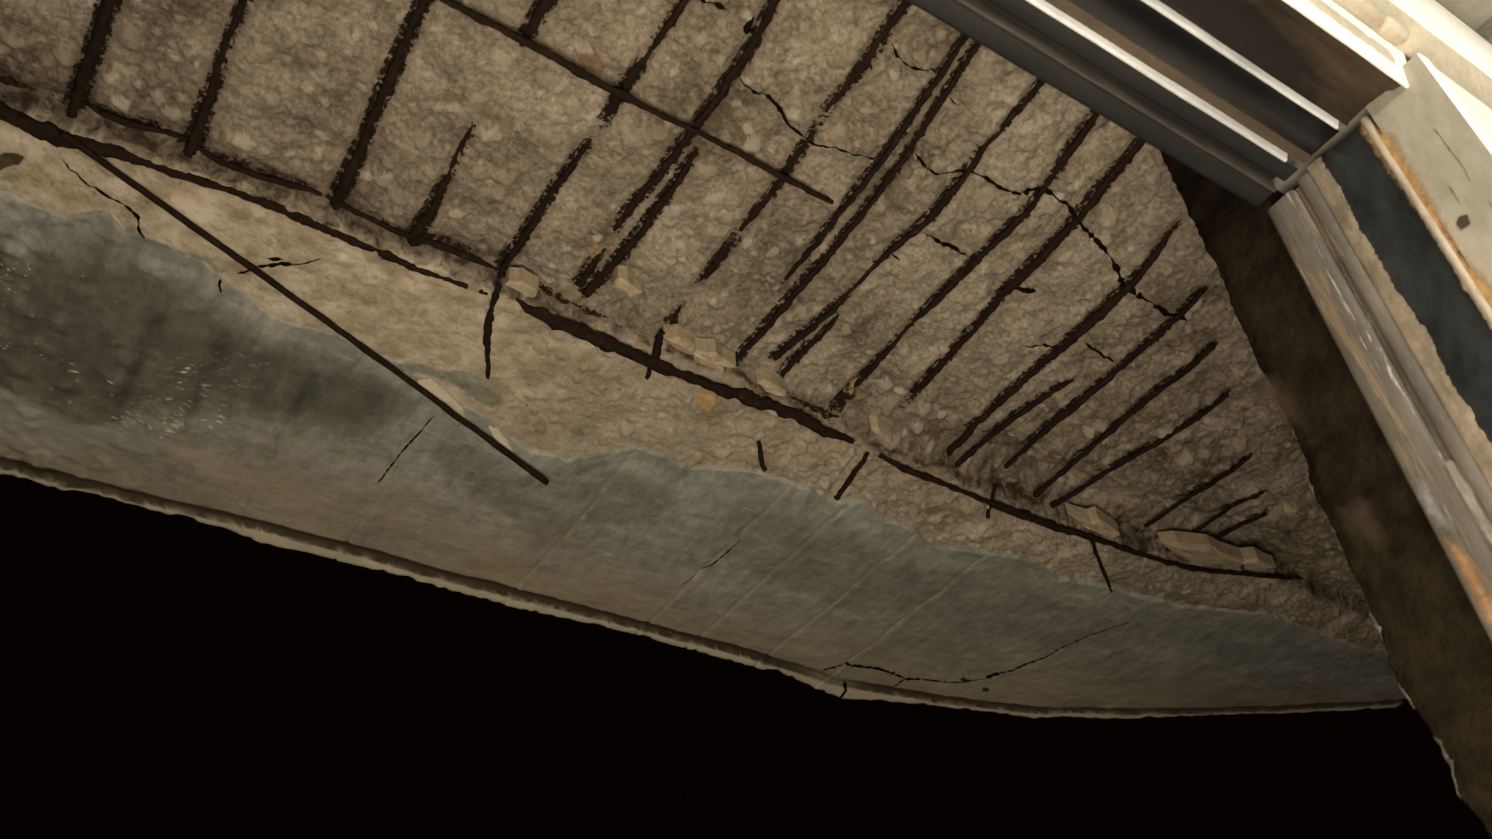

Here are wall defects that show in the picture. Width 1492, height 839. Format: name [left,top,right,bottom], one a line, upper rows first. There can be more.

crack [737,76,875,160]
crack [915,144,1187,321]
rust [1362,126,1492,309]
damp [0,261,393,455]
spalling [0,0,1387,654]
crack [1025,342,1114,362]
crack [823,622,1130,699]